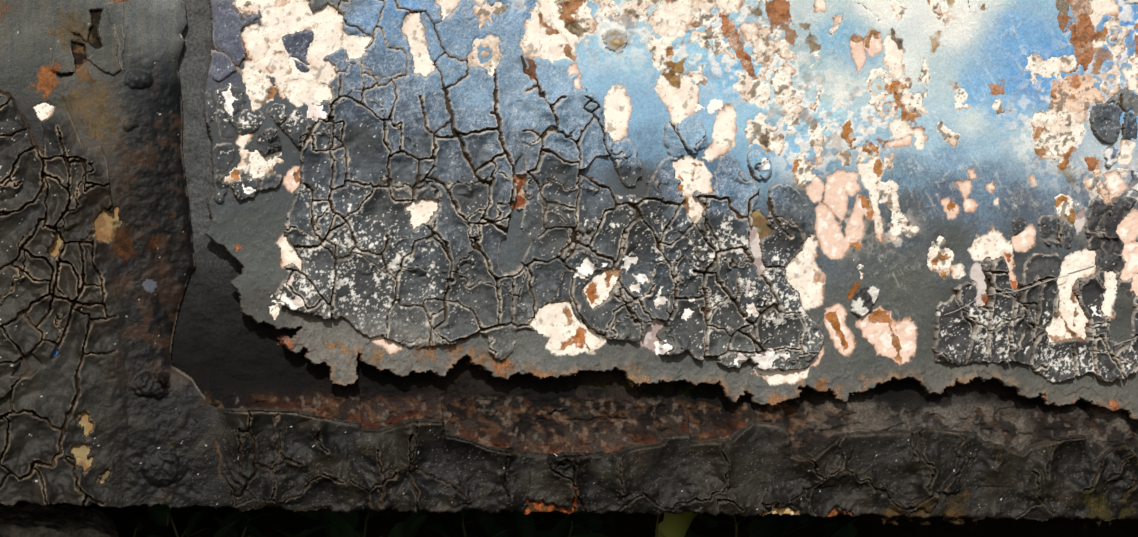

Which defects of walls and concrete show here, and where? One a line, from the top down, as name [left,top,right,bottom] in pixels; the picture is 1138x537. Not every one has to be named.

peeling [233,0,372,111]
corrosion [719,11,759,80]
corrosion [751,0,821,53]
corrosion [1050,0,1112,99]
peeling [222,134,301,192]
crack [204,0,825,371]
peeling [520,0,960,386]
crack [0,89,134,508]
peeling [927,224,1036,307]
crack [931,196,1138,383]
peeling [1046,209,1138,343]
crack [214,410,1138,521]